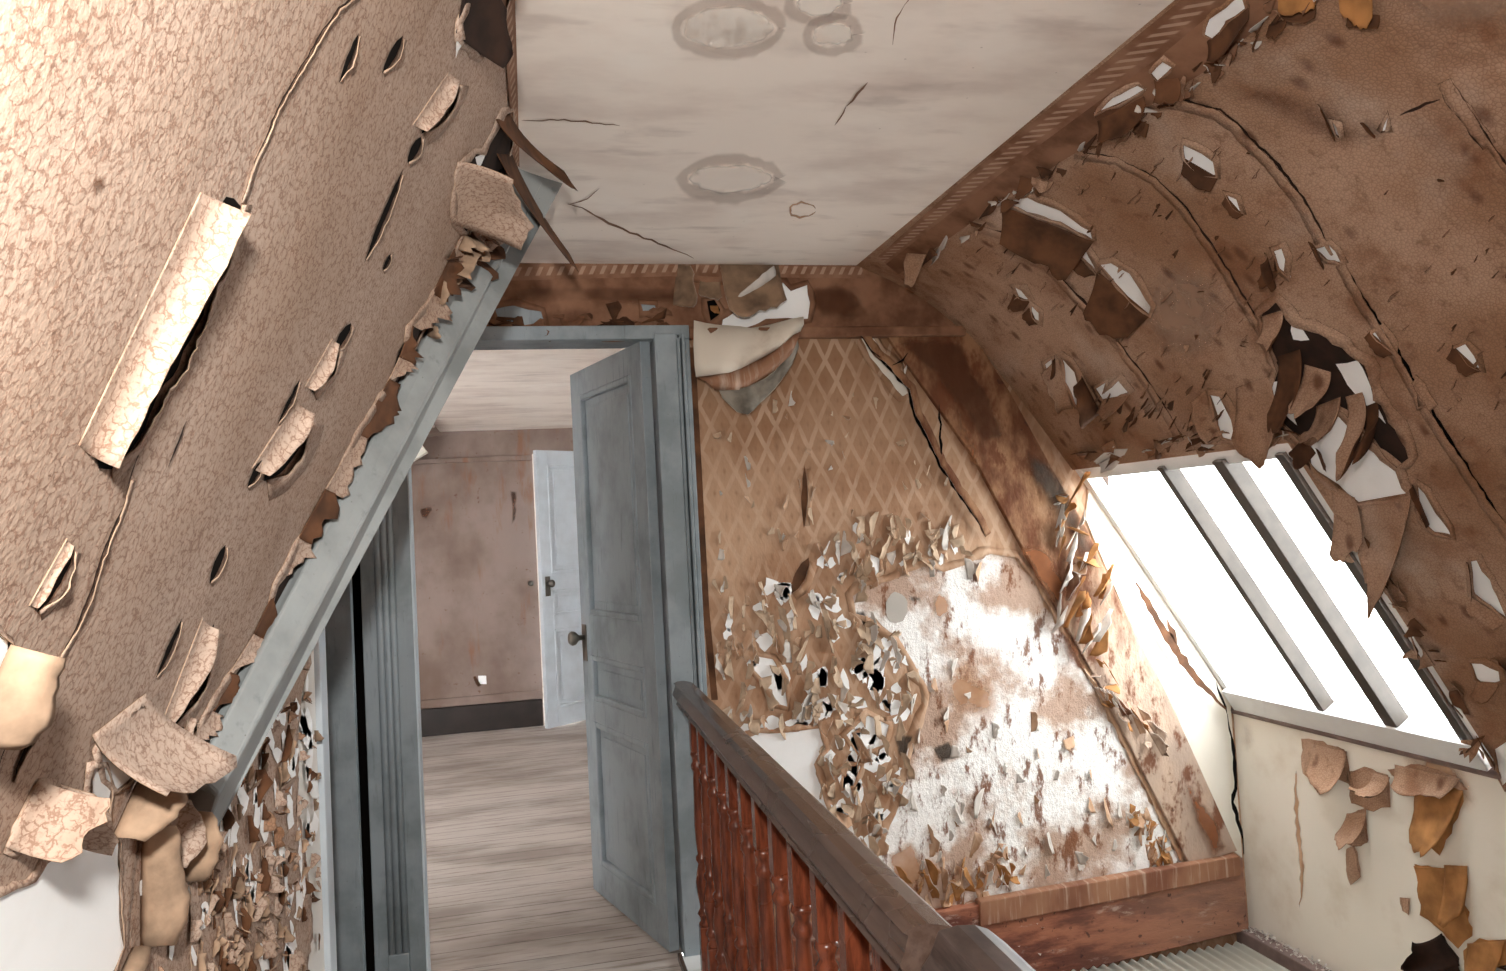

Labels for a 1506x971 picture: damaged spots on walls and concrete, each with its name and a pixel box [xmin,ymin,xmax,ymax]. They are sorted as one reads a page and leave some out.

water stain [685,8,773,48]
water stain [799,0,851,44]
water stain [690,166,771,193]
peeling [1094,369,1212,433]
flaking render [712,471,1185,909]